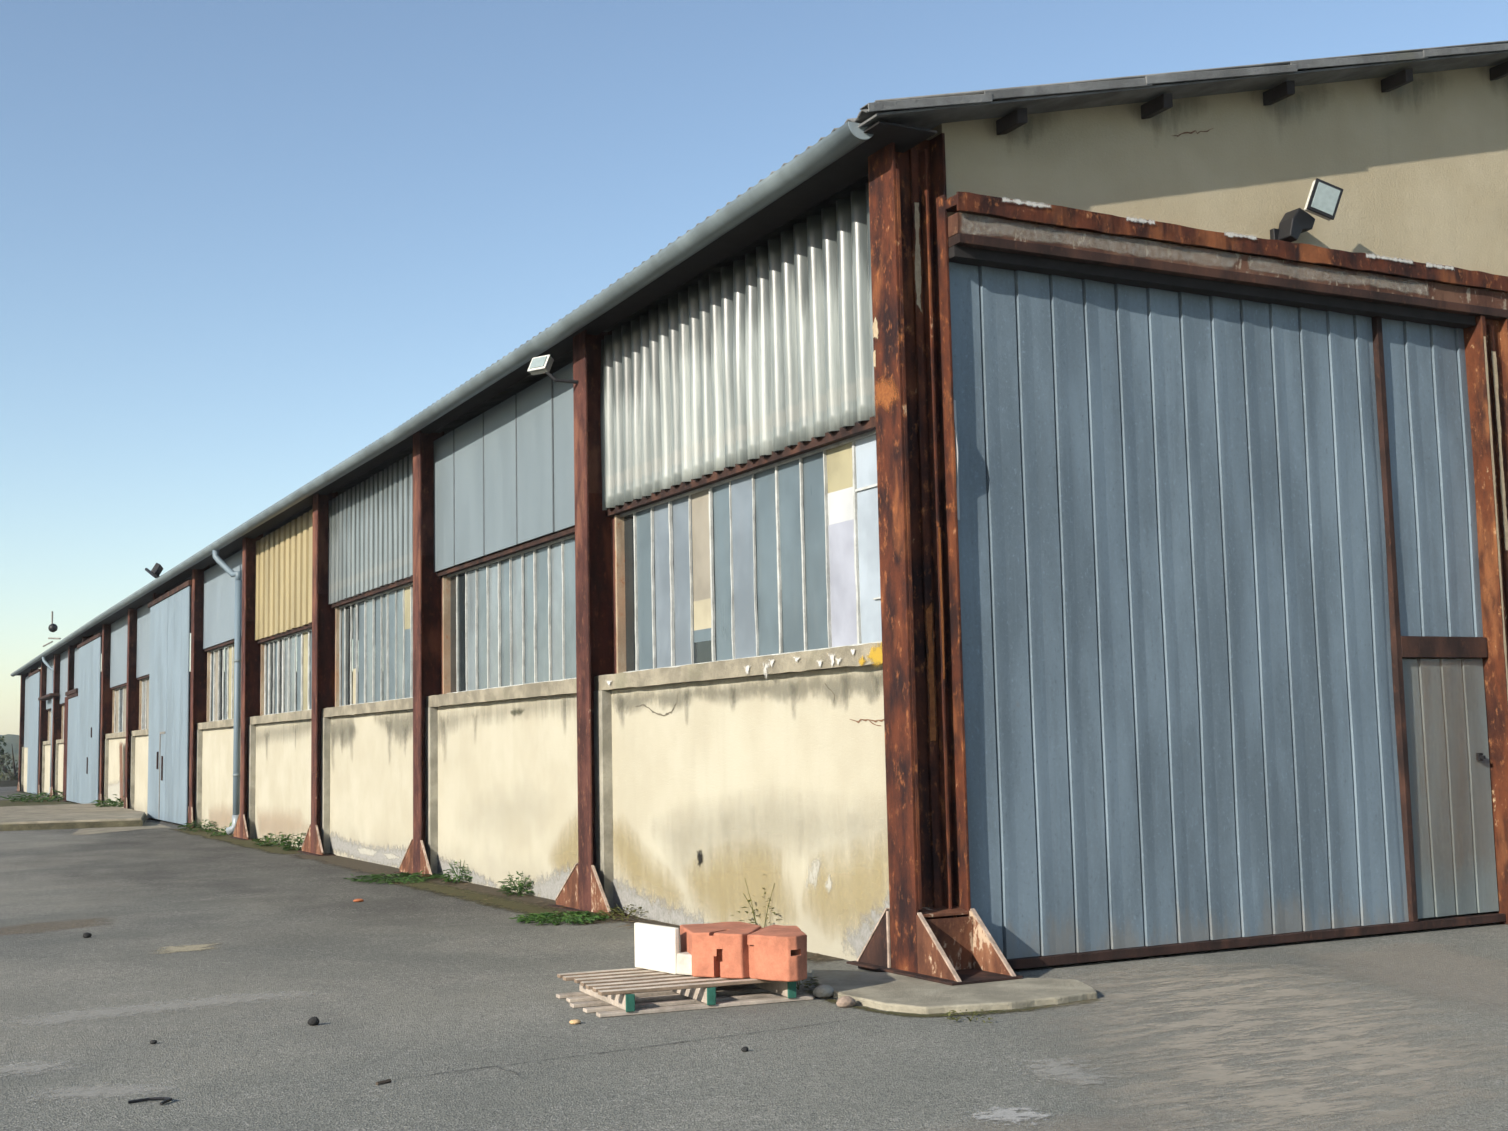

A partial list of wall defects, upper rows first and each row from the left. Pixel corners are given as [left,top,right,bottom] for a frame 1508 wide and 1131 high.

corrosion [875,376,899,411]
corrosion [926,527,945,742]
leakage [561,833,578,870]